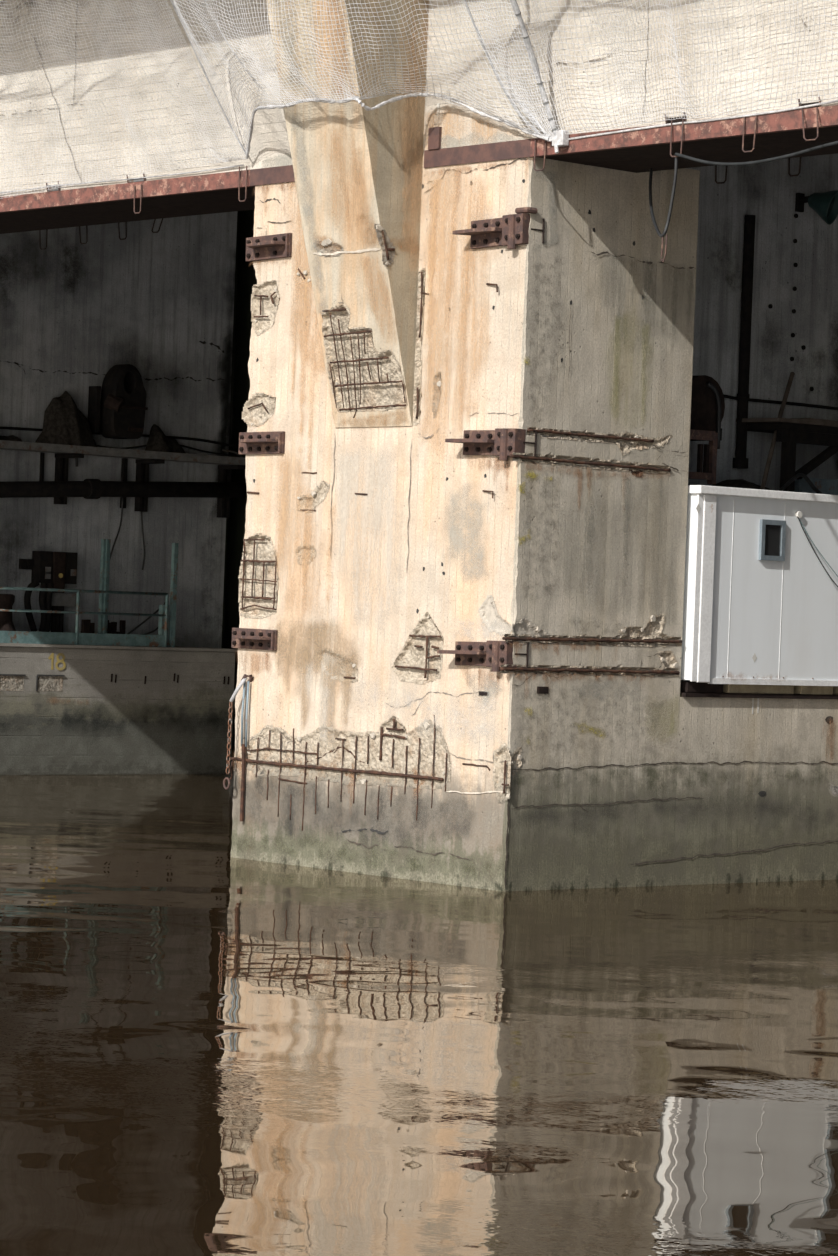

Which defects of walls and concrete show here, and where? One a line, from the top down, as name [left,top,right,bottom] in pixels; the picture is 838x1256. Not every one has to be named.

spalling [314,238,343,257]
spalling [251,280,280,335]
spalling [321,270,442,425]
damp [217,329,236,480]
spalling [242,392,276,427]
spalling [238,533,279,619]
spalling [295,545,316,565]
spalling [391,612,443,684]
spalling [230,715,522,831]